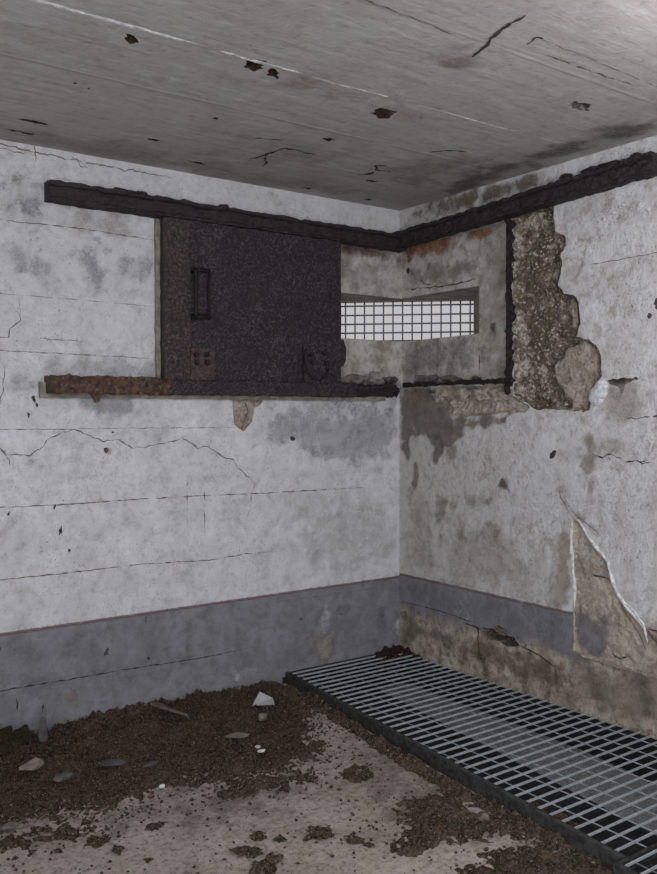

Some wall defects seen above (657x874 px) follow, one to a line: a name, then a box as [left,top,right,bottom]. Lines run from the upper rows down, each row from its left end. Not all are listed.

crack [366,0,457,37]
crack [472,15,657,87]
crack [0,143,170,178]
spalling [402,206,638,417]
crack [0,293,154,404]
spalling [232,399,263,431]
crack [0,427,365,518]
damp [269,387,510,570]
crack [0,551,276,580]
flaking render [569,518,657,679]
crack [0,648,247,692]